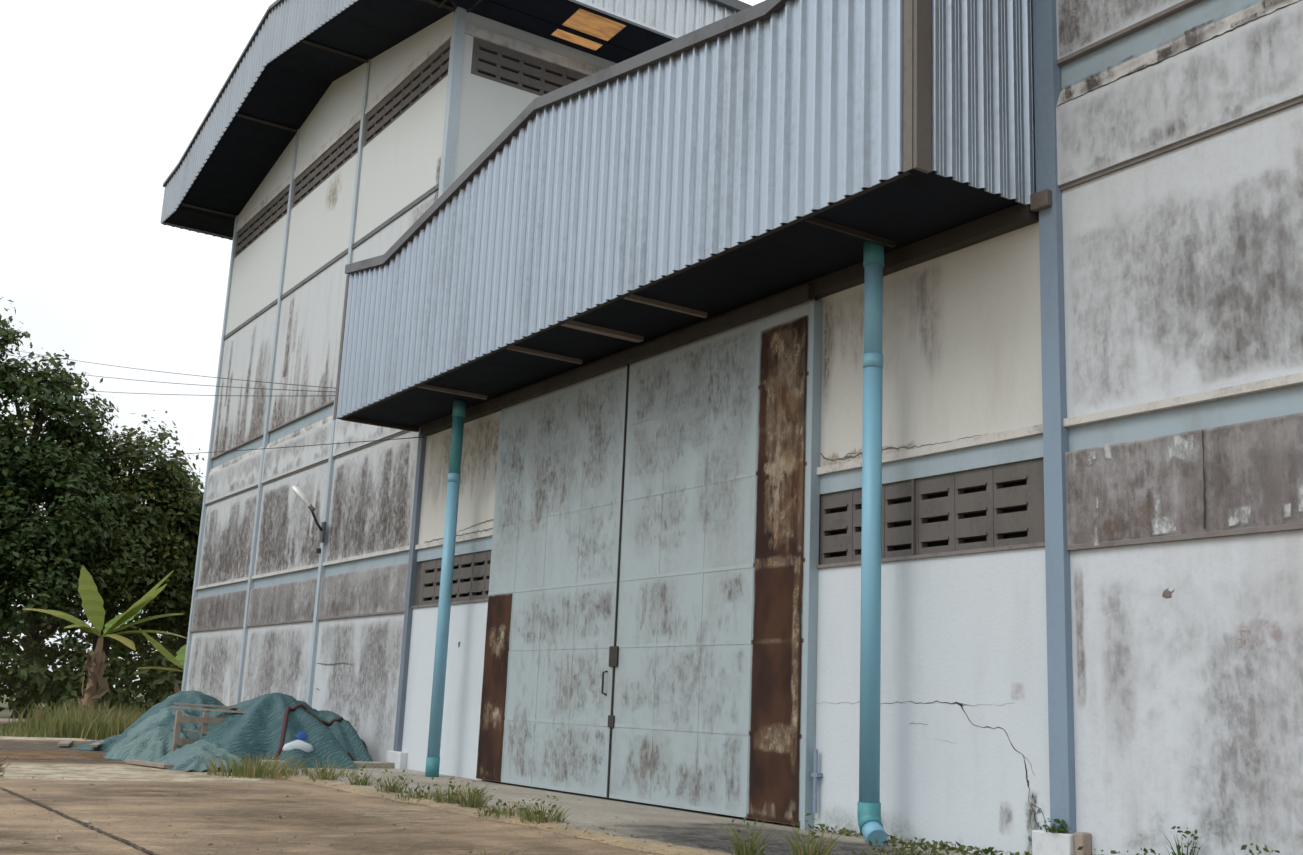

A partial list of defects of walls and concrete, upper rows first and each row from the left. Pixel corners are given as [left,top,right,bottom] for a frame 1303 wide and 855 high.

flaking render [1057,0,1301,107]
water stain [214,321,332,466]
water stain [193,445,409,630]
rust [749,316,808,824]
peeling [1089,443,1112,464]
peeling [1153,500,1176,534]
peeling [1154,435,1193,460]
peeling [1229,506,1251,526]
peeling [1284,484,1303,517]
rust [476,594,512,781]
crack [826,700,1045,829]